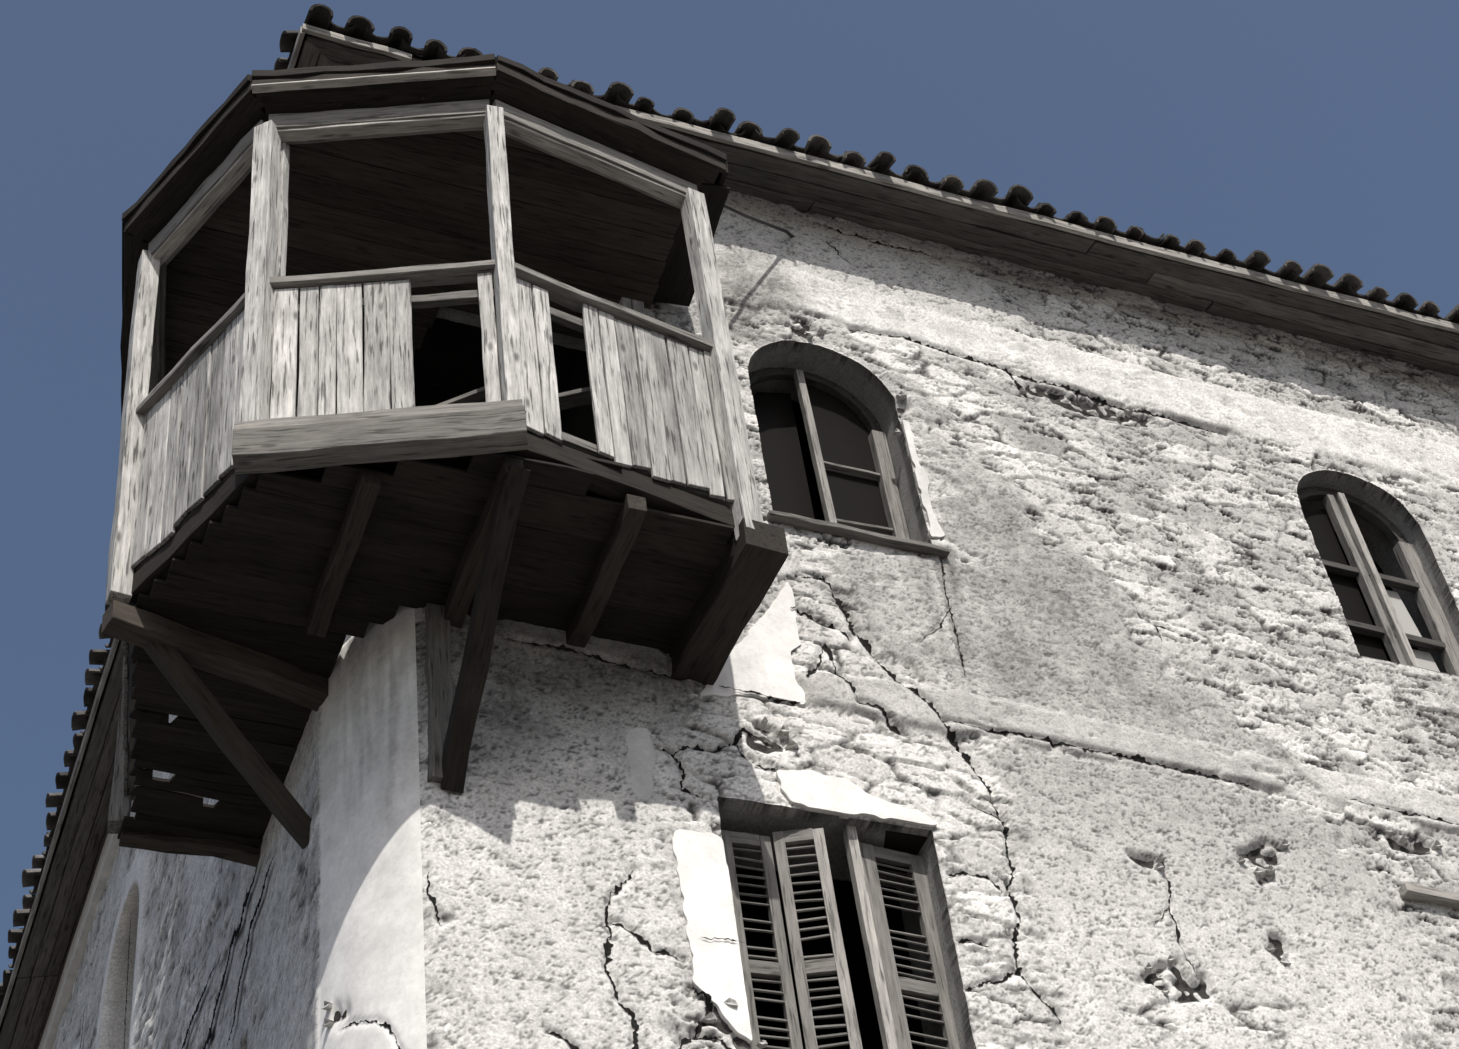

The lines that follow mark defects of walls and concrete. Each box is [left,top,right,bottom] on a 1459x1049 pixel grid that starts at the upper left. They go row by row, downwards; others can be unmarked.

crack [507,638,681,681]
crack [654,728,784,798]
crack [719,558,1254,1032]
crack [603,869,747,1049]
spalling [1144,955,1210,1002]
crack [338,1019,401,1049]
crack [548,1032,579,1049]